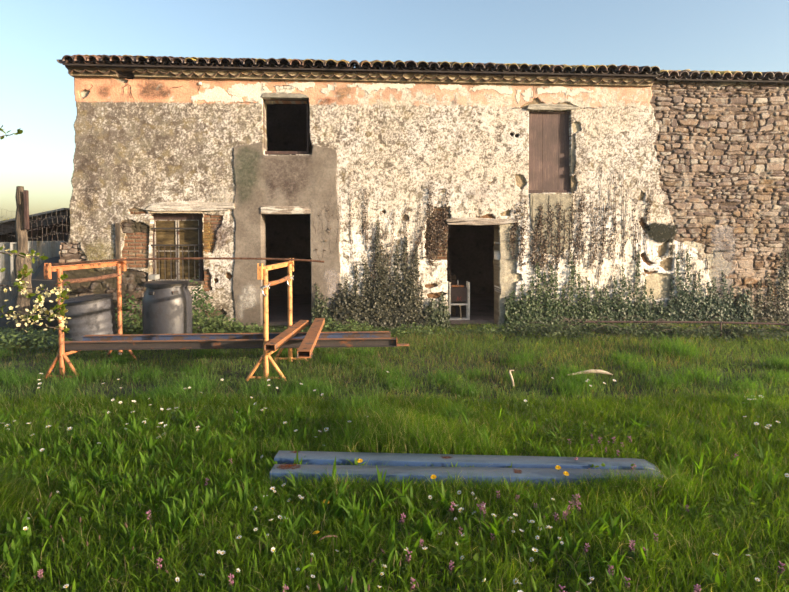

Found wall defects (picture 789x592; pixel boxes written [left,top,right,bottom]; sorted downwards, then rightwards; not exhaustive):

peeling [190,81,336,105]
peeling [347,82,415,95]
peeling [435,84,593,112]
spalling [203,214,223,253]
spalling [424,207,451,260]
spalling [58,208,150,331]
spalling [641,242,673,299]